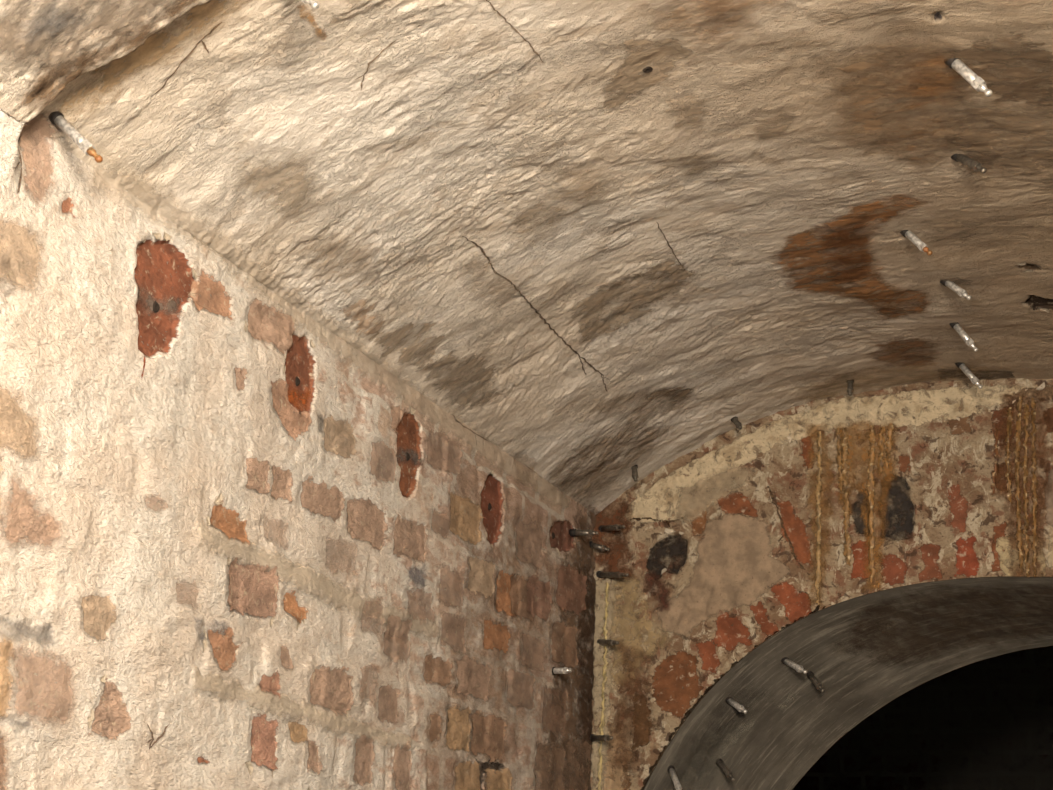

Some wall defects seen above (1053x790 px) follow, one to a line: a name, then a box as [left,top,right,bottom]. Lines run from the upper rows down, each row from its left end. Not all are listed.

damp [0,0,237,109]
crack [486,0,543,62]
damp [947,32,1053,174]
spalling [134,232,357,458]
crack [462,236,610,391]
rust [774,195,928,317]
peeling [245,457,587,686]
spalling [370,405,463,498]
peeling [625,382,1053,611]
rust [807,423,897,604]
rust [996,395,1049,577]
flaking render [631,581,812,752]